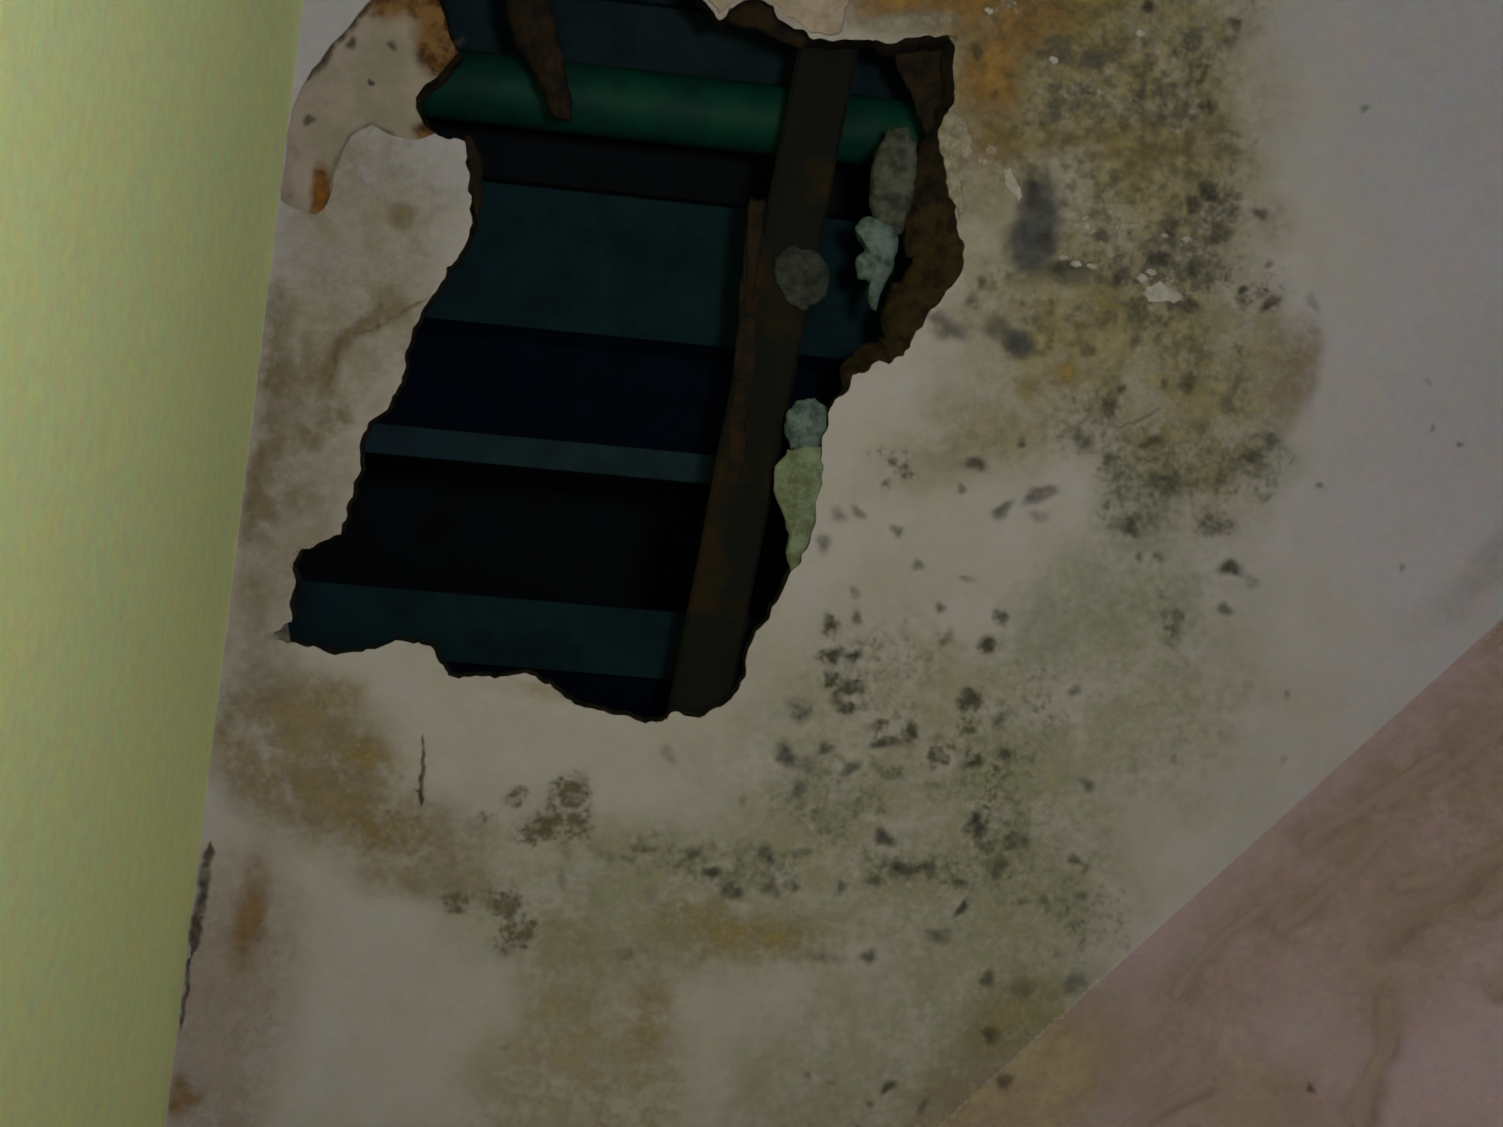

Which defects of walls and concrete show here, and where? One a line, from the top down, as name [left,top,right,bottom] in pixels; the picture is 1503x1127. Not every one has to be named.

peeling [281,0,462,215]
corrosion [861,0,1076,113]
flaking render [938,110,973,219]
water stain [875,0,1311,500]
water stain [220,141,433,846]
water stain [1221,561,1238,574]
water stain [819,616,858,713]
water stain [521,777,591,846]
water stain [493,892,561,951]
water stain [582,688,1102,1127]